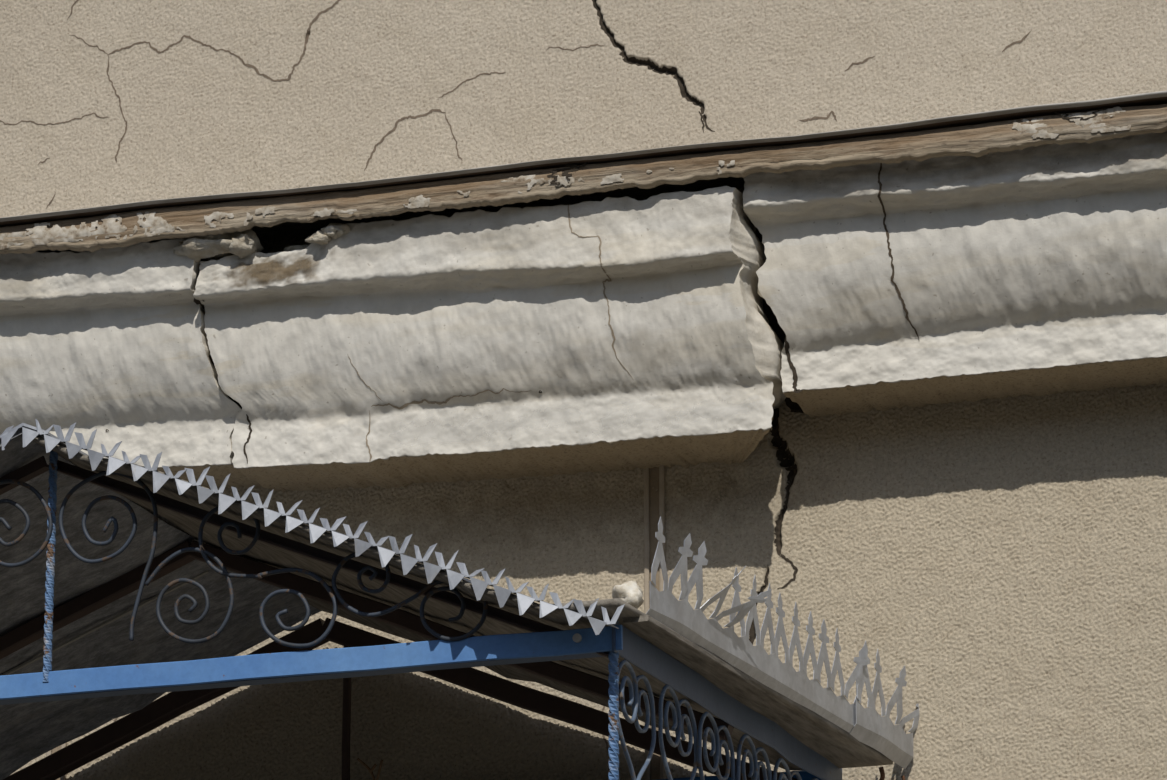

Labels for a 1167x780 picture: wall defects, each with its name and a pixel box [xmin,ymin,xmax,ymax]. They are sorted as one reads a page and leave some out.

crack [0,0,340,163]
crack [364,72,505,171]
crack [548,0,715,132]
peeling [0,206,279,262]
spalling [284,208,358,252]
peeling [403,195,431,209]
crack [547,162,633,379]
crack [755,227,765,247]
crack [878,163,919,339]
crack [209,355,252,464]
crack [348,356,529,460]
crack [749,298,804,645]